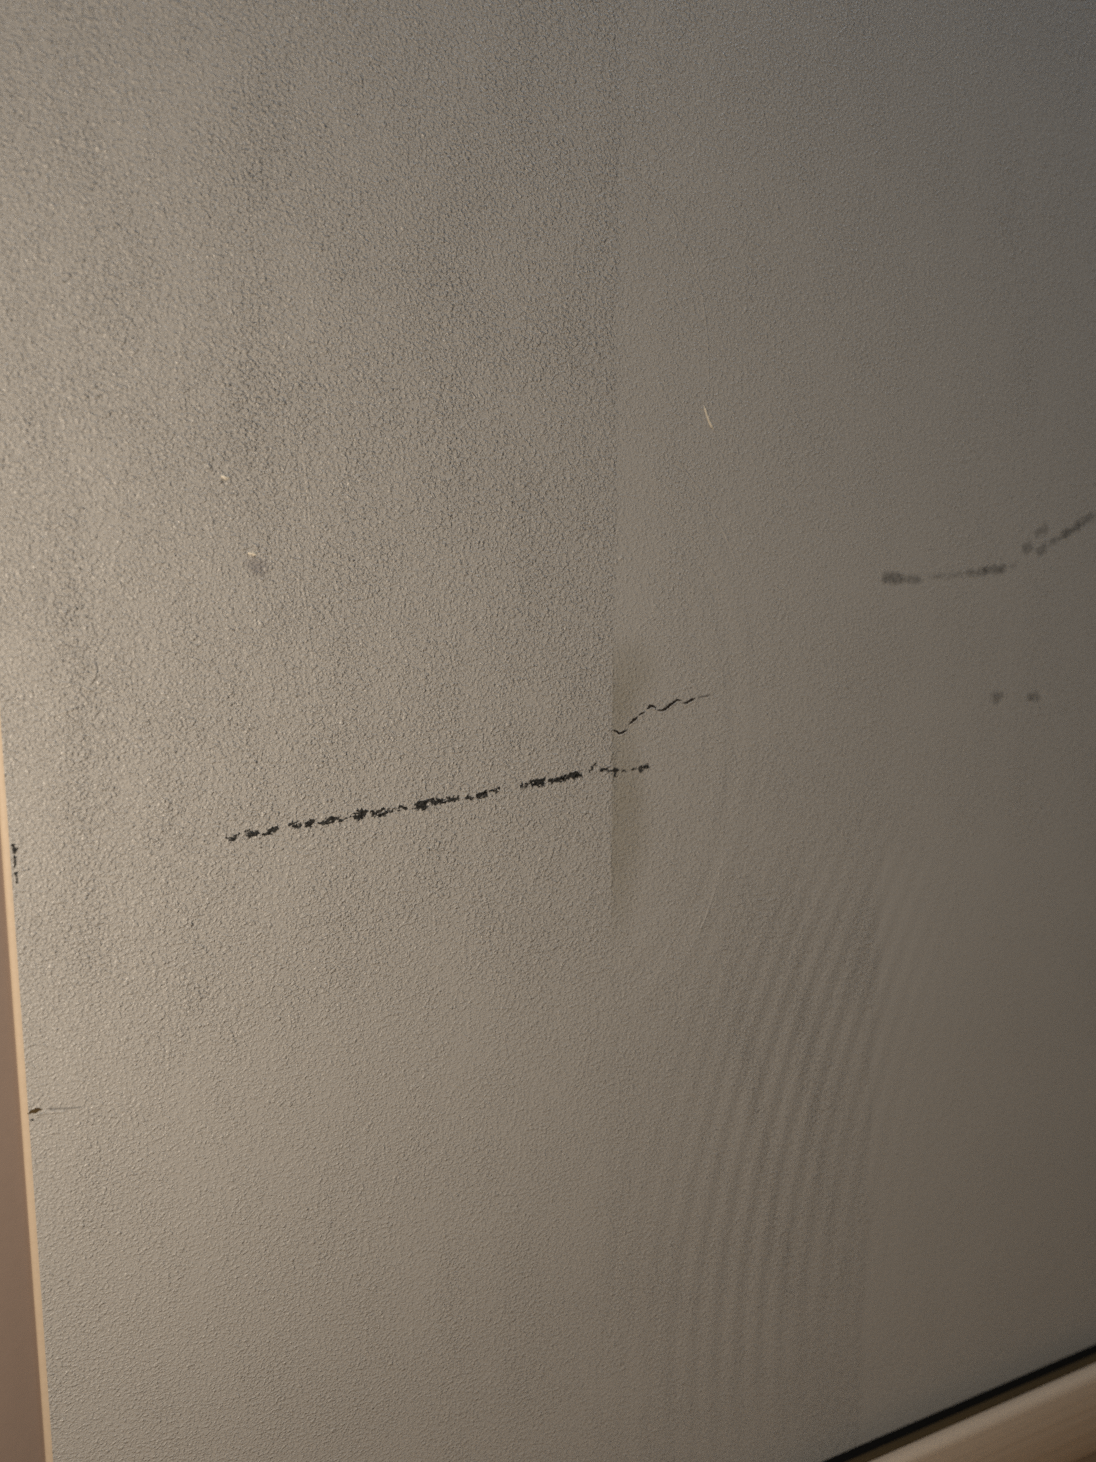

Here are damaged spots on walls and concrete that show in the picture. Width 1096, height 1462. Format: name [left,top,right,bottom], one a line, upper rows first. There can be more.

crack [613,698,696,737]